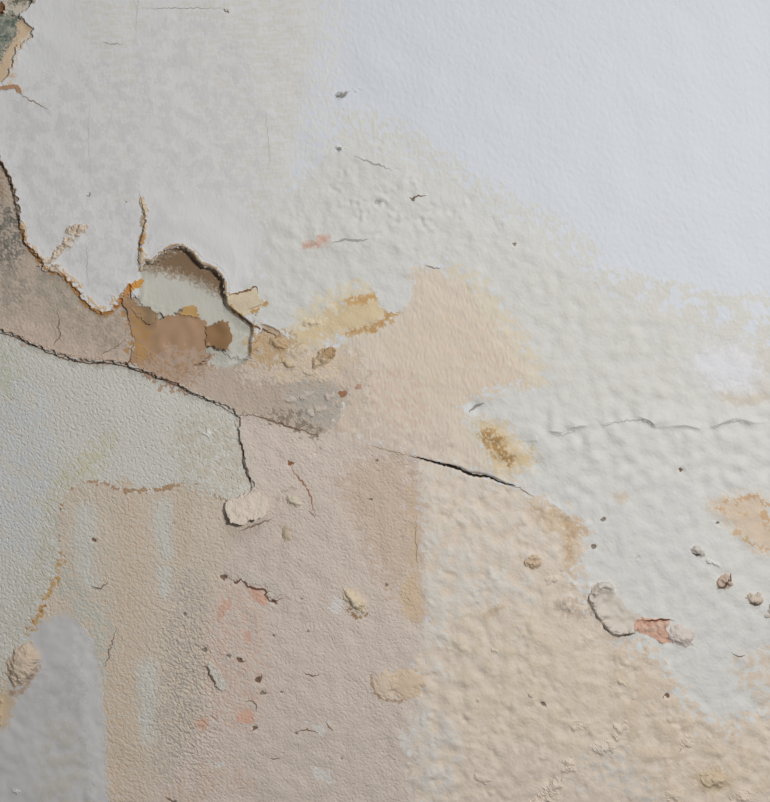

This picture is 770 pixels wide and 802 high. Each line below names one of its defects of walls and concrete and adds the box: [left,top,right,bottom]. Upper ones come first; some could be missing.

spalling [0,0,31,67]
leakage [0,0,36,85]
peeling [0,84,22,93]
crack [0,310,321,437]
crack [603,419,655,430]
spalling [0,159,434,802]
crack [240,441,252,489]
crack [290,465,315,517]
crack [370,445,534,497]